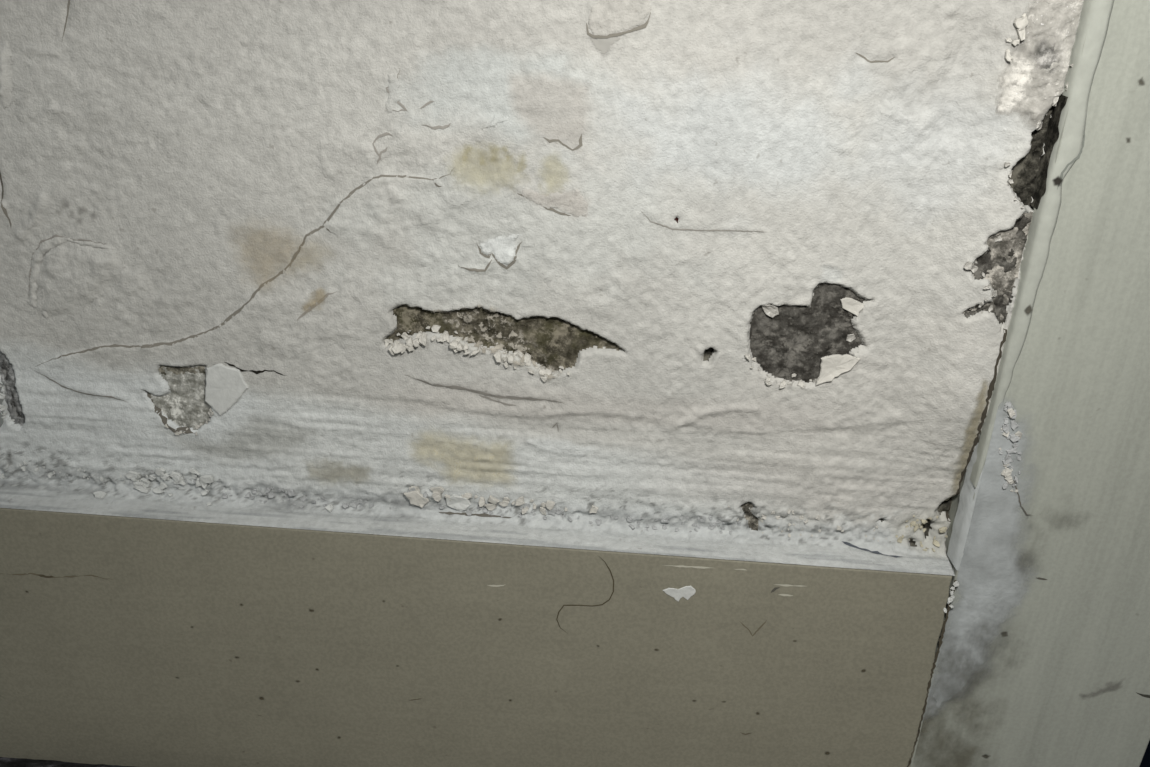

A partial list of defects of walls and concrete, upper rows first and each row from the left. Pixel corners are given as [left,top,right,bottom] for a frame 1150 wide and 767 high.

spalling [963,0,1083,324]
crack [34,170,452,402]
spalling [384,305,622,382]
spalling [745,283,865,389]
spalling [0,352,25,426]
spalling [141,362,283,435]
spalling [120,467,374,512]
spalling [404,486,821,538]